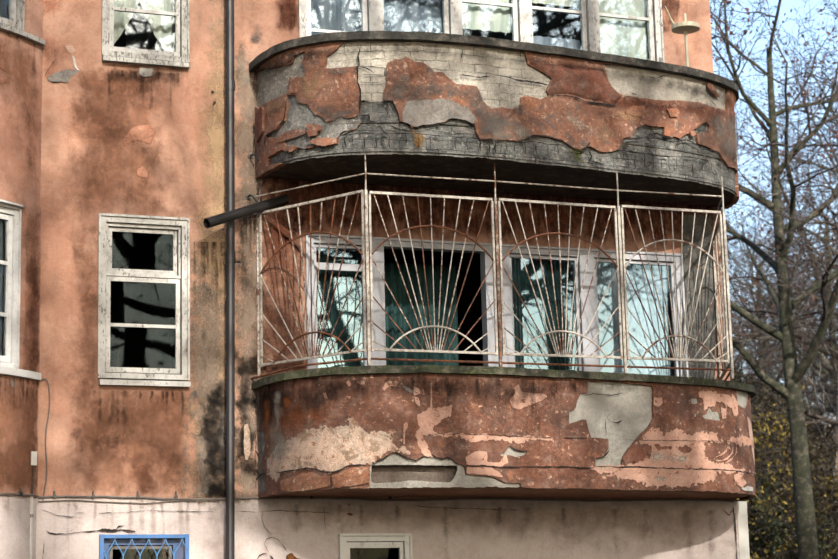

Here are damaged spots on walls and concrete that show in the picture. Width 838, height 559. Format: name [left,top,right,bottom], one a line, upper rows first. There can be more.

peeling [47,45,80,83]
leakage [278,0,298,29]
flaking render [239,41,736,196]
leakage [664,0,679,30]
leakage [0,214,39,488]
leakage [76,30,717,502]
flaking render [681,214,716,379]
peeling [244,380,554,494]
peeling [569,381,756,491]